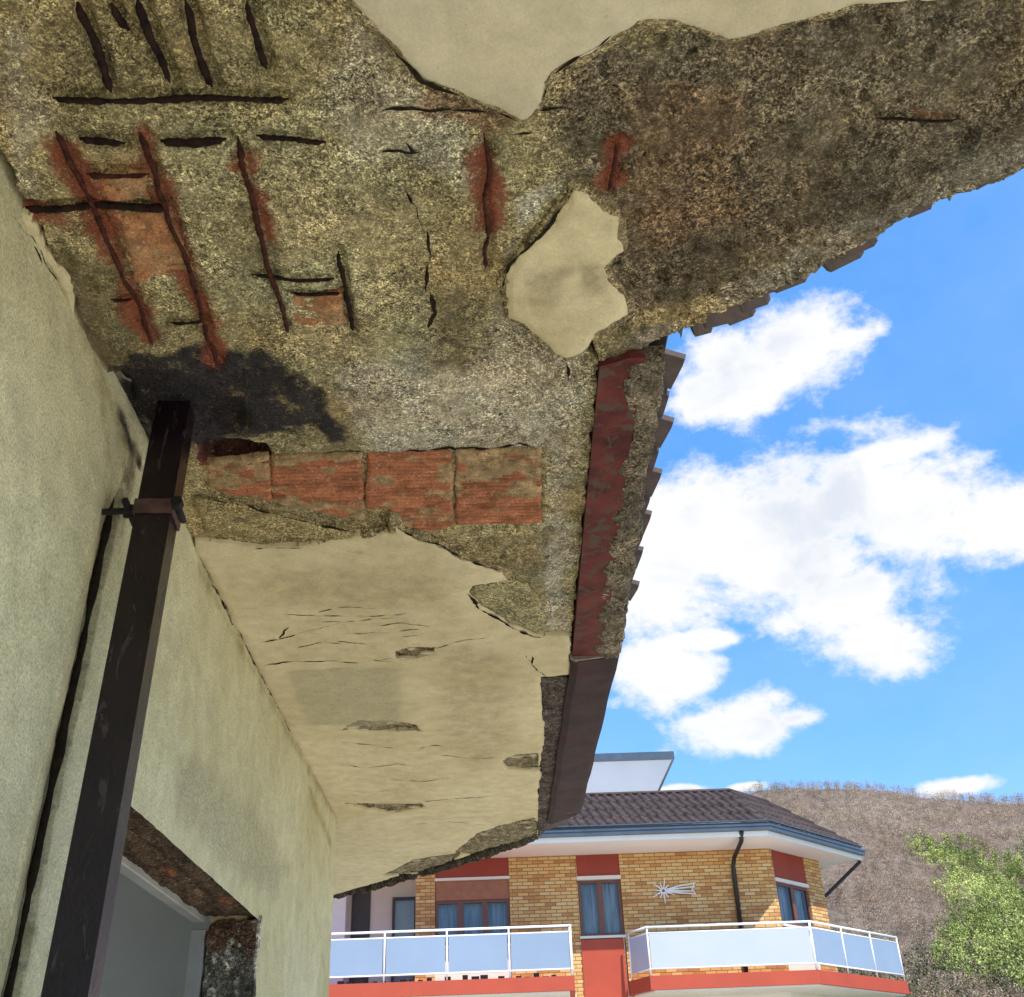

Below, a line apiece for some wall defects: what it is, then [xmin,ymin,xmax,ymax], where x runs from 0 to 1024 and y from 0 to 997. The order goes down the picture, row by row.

corrosion [50,136,159,342]
corrosion [124,124,226,367]
water stain [64,256,344,469]
crack [405,189,437,328]
corrosion [467,131,510,234]
spalling [0,0,1024,641]
crack [203,565,545,731]